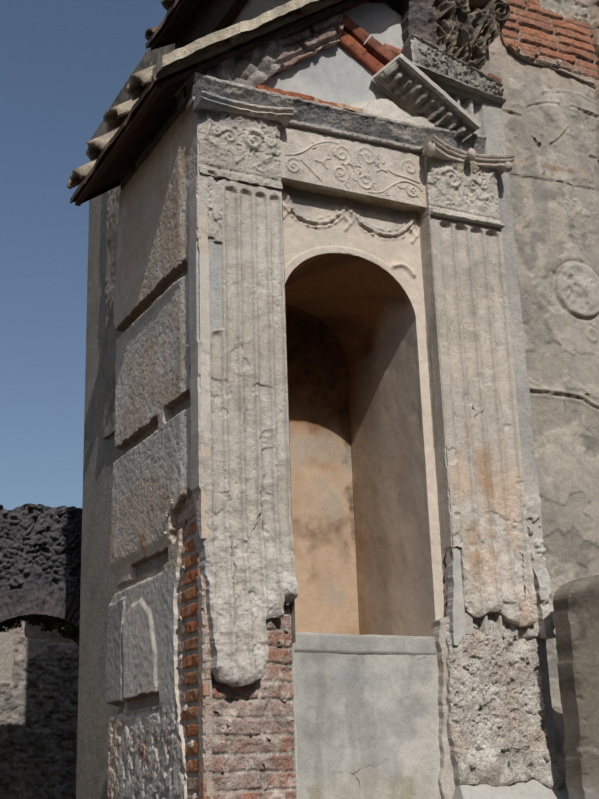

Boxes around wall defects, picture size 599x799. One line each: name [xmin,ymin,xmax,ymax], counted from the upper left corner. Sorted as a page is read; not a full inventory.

spalling [445,613,565,791]